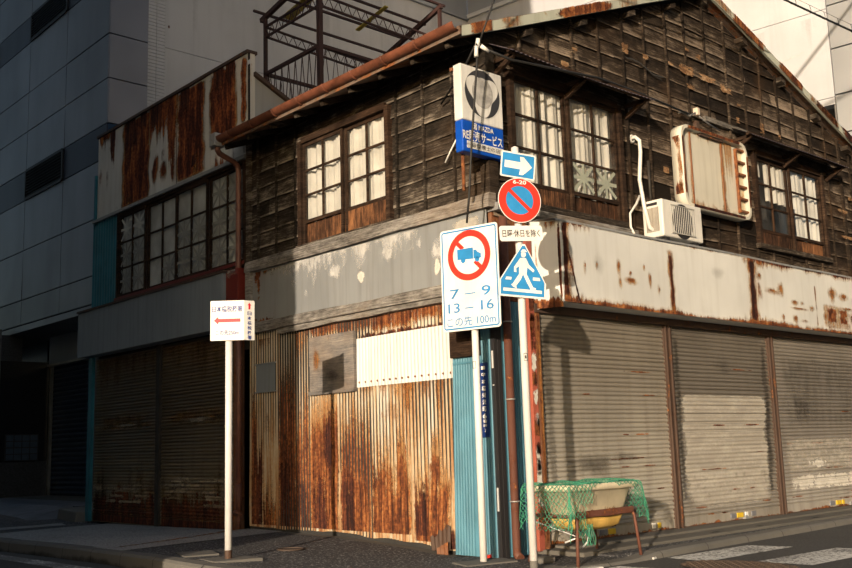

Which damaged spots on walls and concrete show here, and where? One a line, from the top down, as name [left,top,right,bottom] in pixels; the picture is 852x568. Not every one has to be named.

rust [470,19,492,33]
rust [558,1,612,18]
rust [100,58,247,208]
rust [672,125,752,219]
rust [296,304,443,358]
rust [534,221,852,483]
rust [93,469,237,547]
rust [251,373,456,549]